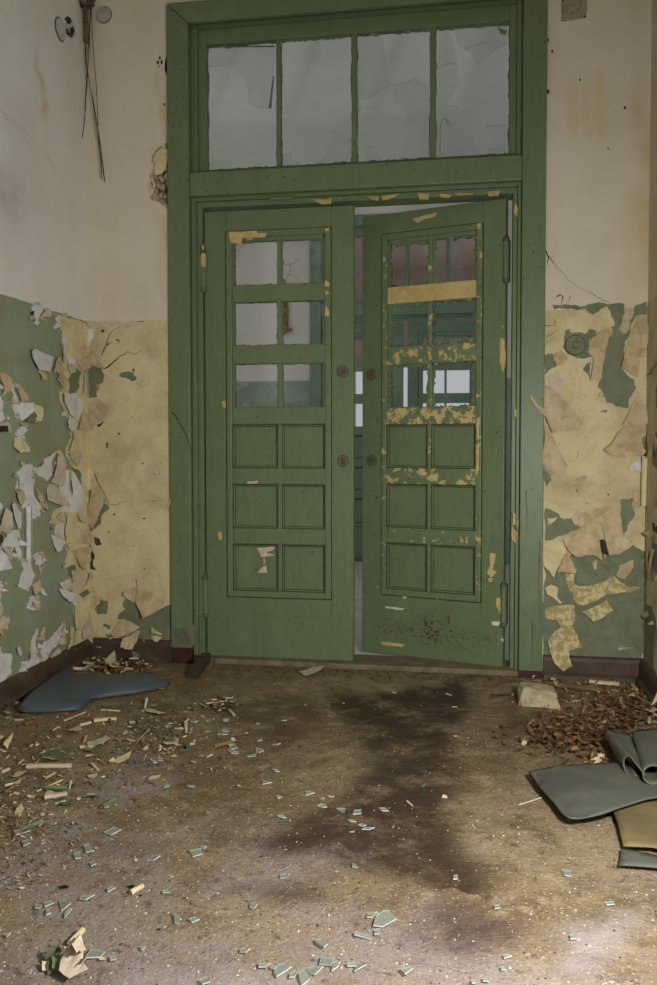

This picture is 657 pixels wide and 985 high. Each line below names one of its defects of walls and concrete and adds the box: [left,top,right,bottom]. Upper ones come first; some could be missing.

spalling [147,143,168,208]
peeling [0,302,195,682]
peeling [530,296,657,675]